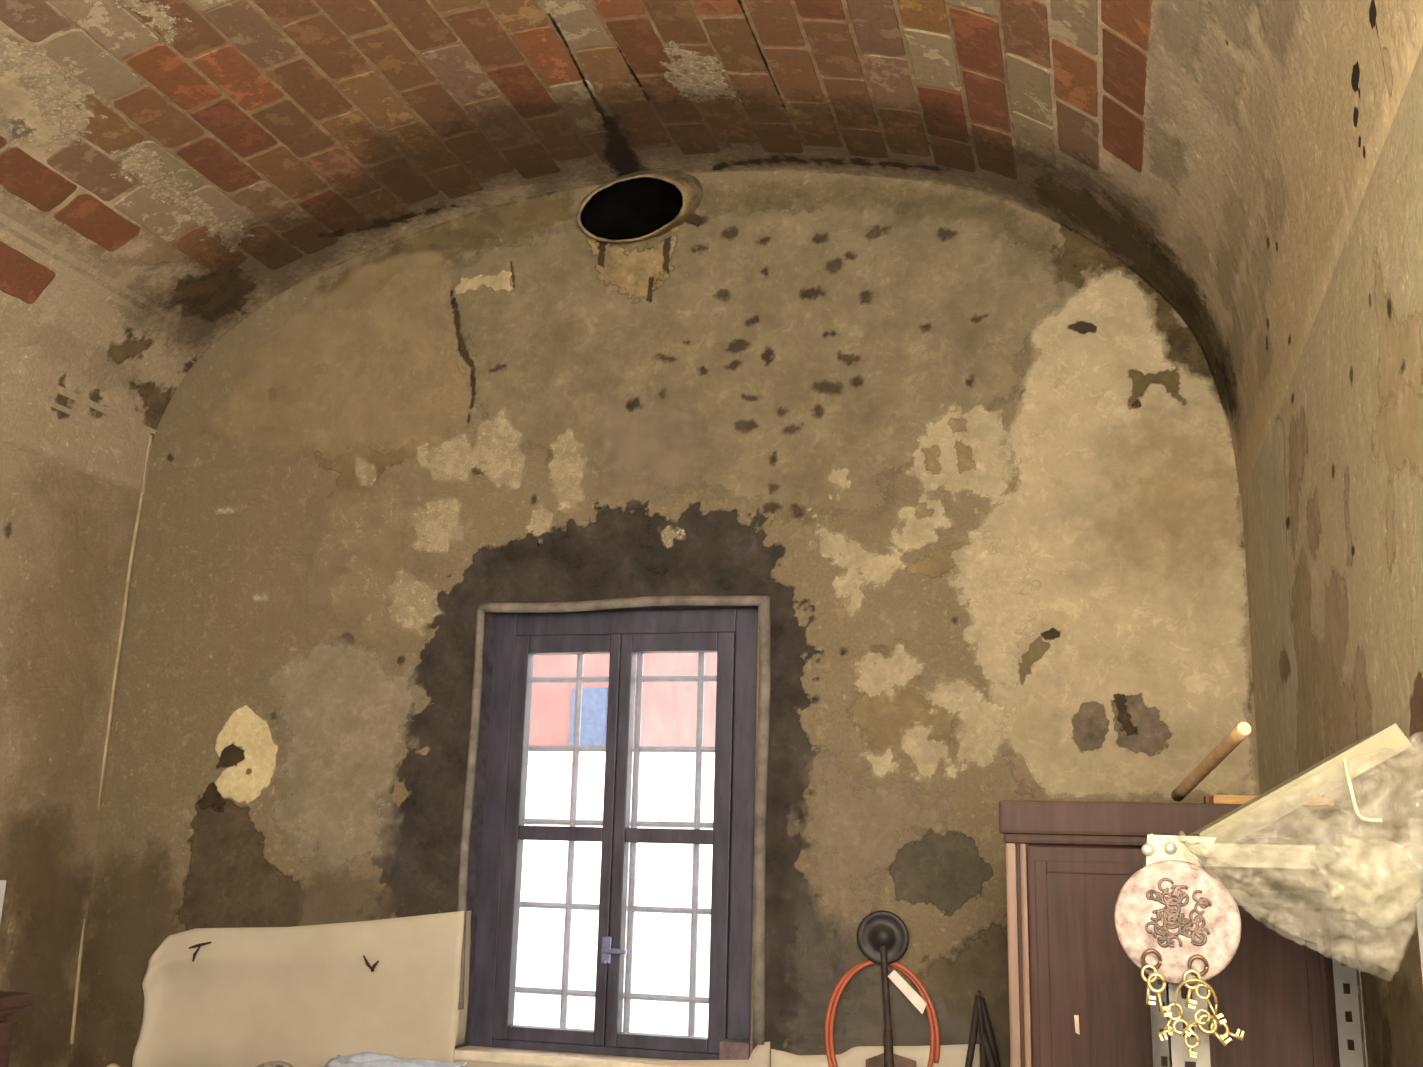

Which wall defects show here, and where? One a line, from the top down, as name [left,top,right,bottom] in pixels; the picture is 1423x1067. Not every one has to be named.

water stain [50,374,106,419]
water stain [108,328,152,364]
water stain [130,382,177,443]
water stain [144,95,1239,437]
spalling [314,189,1256,799]
water stain [0,500,1011,1067]